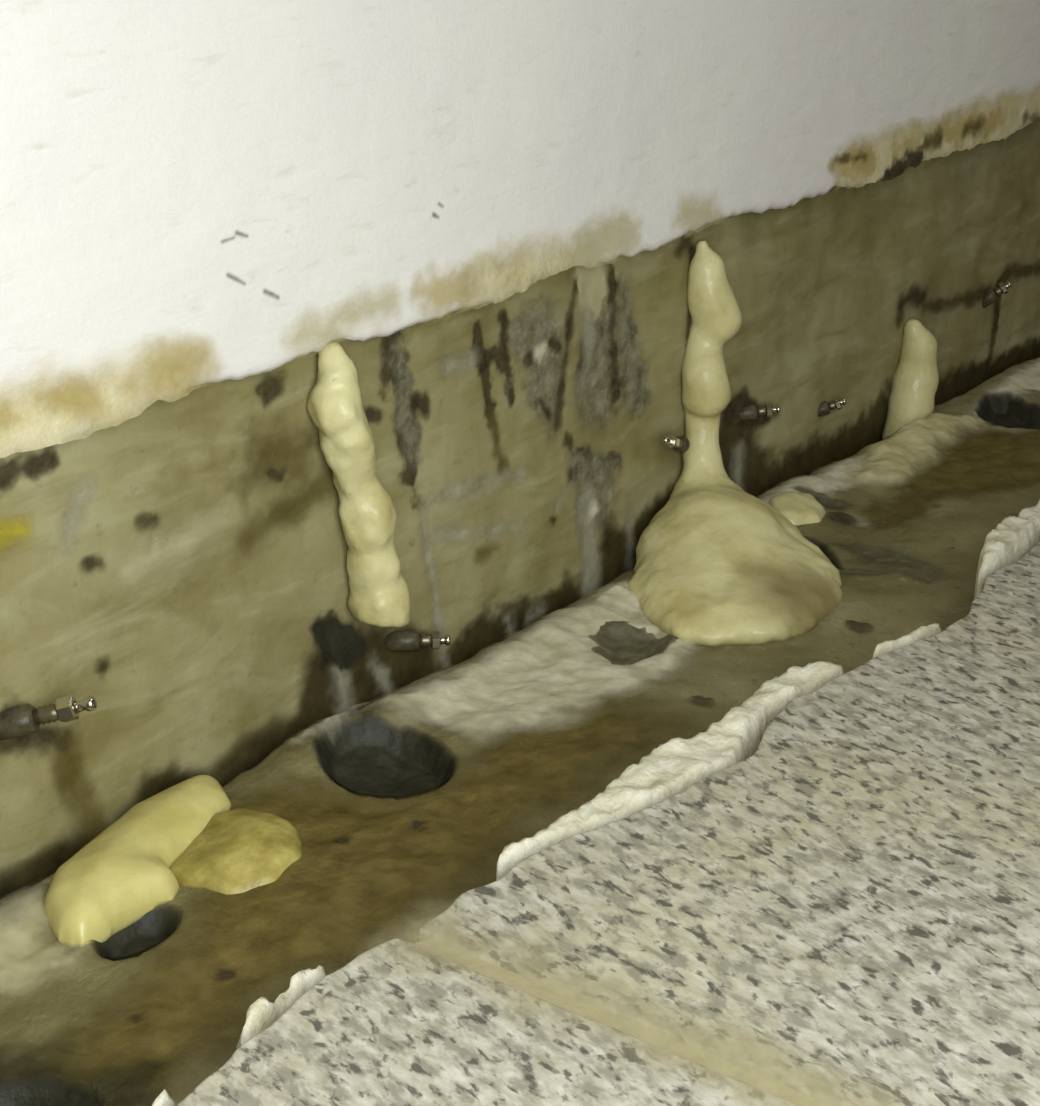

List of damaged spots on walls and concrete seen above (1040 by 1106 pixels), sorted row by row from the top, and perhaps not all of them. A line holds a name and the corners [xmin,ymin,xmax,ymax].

flaking render [833,87,1040,187]
damp [430,218,636,306]
peeling [0,346,201,458]
spalling [473,265,648,528]
damp [934,339,1040,406]
damp [253,436,315,477]
damp [719,382,1040,527]
damp [242,470,334,545]
spalling [974,499,1040,599]
spalling [873,623,943,658]
damp [0,490,695,1106]
spalling [496,661,844,881]